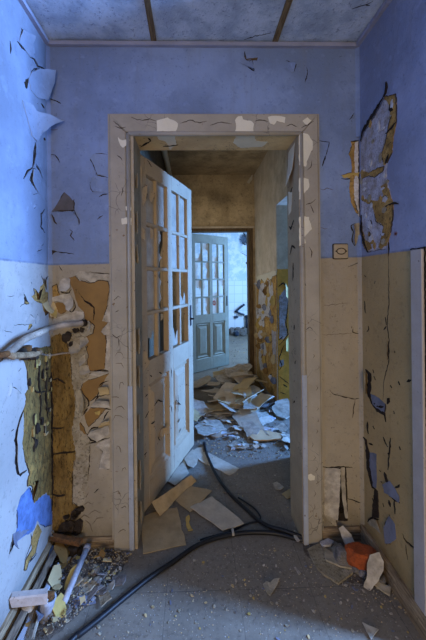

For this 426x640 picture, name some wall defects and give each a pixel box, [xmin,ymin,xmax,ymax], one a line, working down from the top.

crack [10,24,45,72]
peeling [22,68,64,141]
crack [23,142,60,183]
peeling [40,192,80,240]
spalling [132,116,316,257]
spalling [341,82,398,253]
spalling [253,267,296,403]
crack [329,242,411,392]
spalling [9,271,124,571]
peeling [308,466,360,526]
peeling [363,437,400,544]